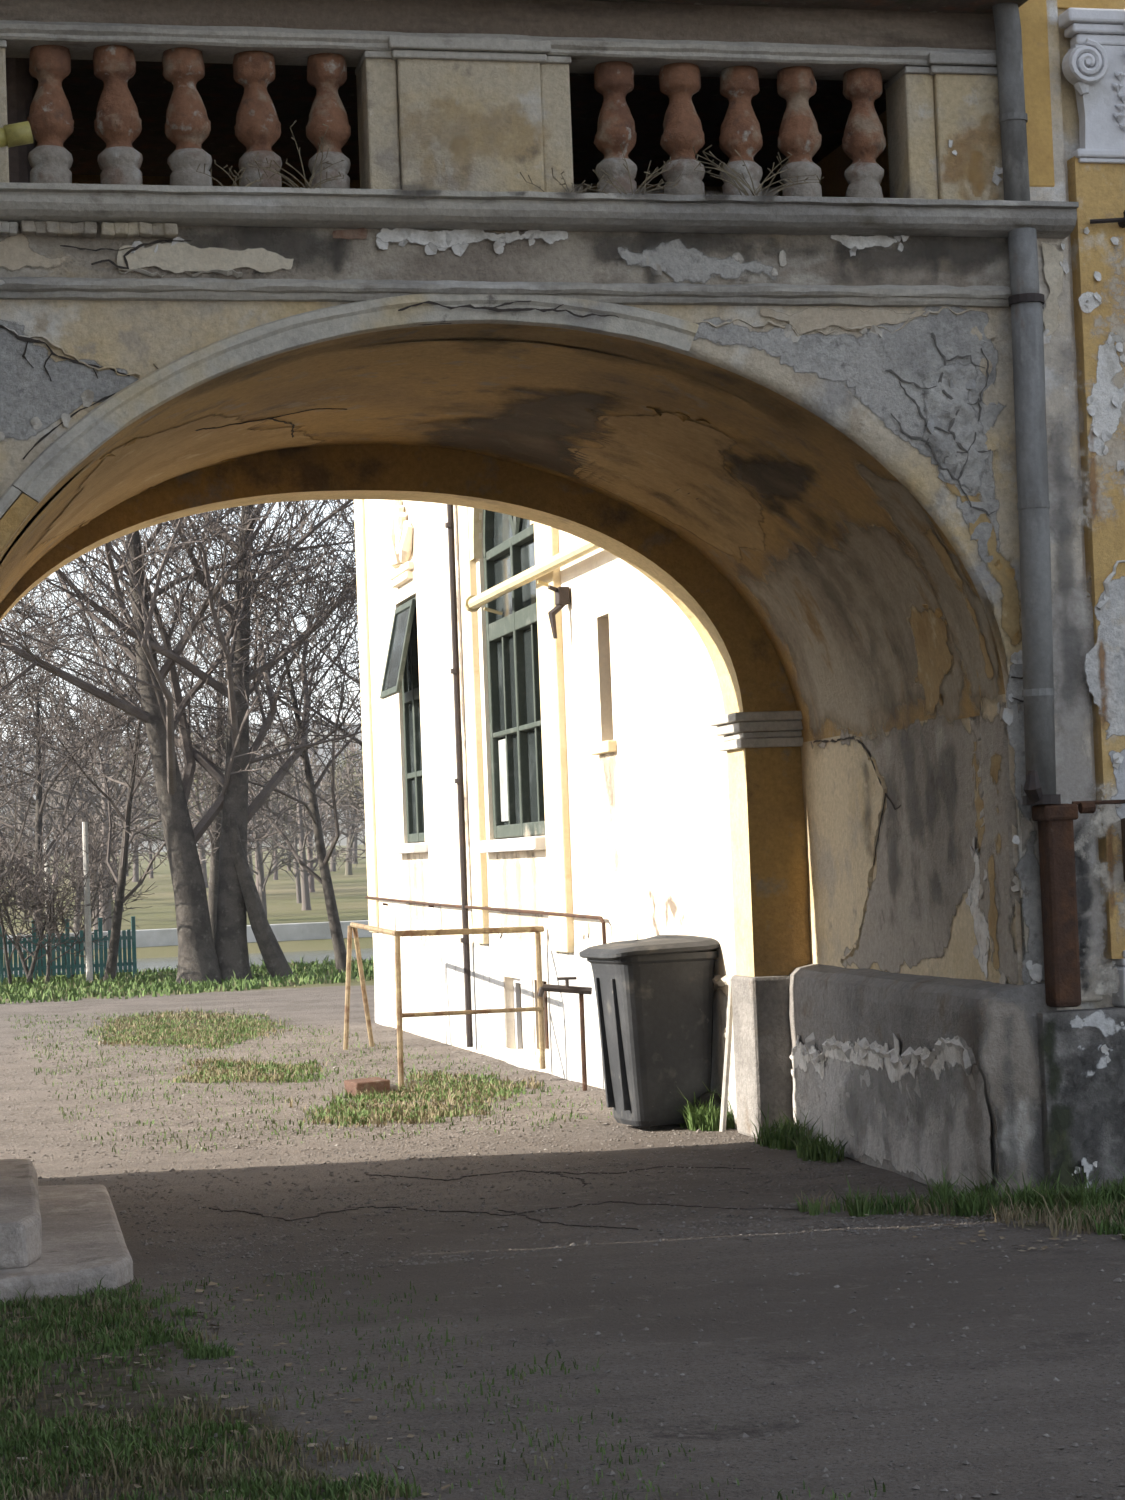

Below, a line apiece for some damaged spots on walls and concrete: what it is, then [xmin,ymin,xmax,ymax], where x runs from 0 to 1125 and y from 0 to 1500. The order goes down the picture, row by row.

peeling [0,220,294,286]
spalling [332,228,568,257]
peeling [618,239,787,284]
spalling [0,320,141,441]
crack [195,408,347,438]
damp [423,388,619,478]
peeling [1078,237,1125,518]
damp [727,453,814,514]
spalling [693,306,1045,984]
spalling [1074,560,1125,927]
spalling [789,1032,993,1193]
crack [209,1166,798,1230]